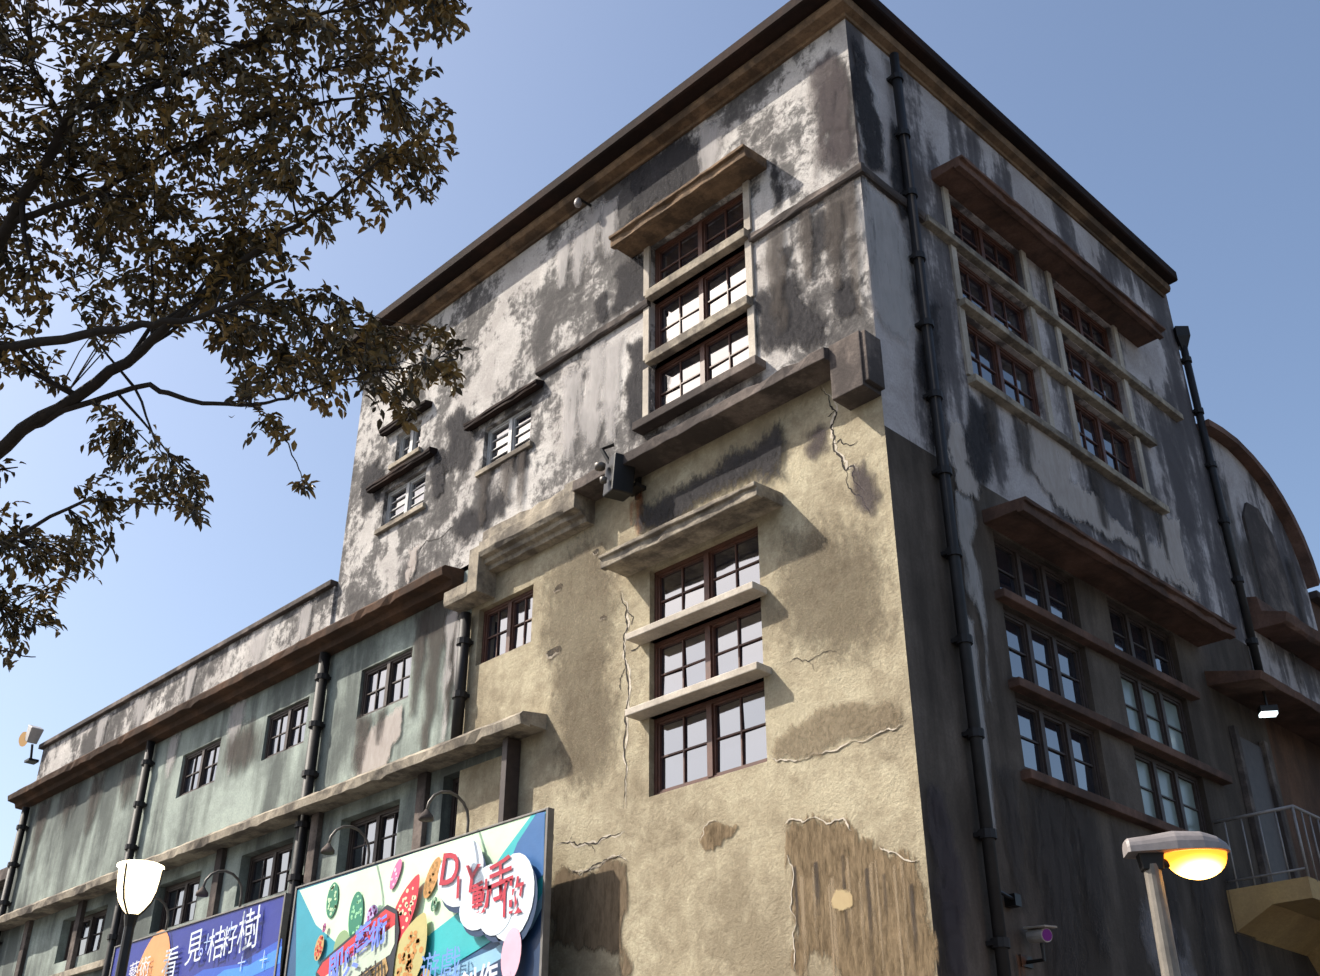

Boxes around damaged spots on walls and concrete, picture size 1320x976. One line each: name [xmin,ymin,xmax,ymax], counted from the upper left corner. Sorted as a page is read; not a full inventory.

water stain [754,36,908,356]
water stain [729,373,762,396]
water stain [359,457,383,517]
water stain [430,406,530,543]
crack [821,388,870,513]
water stain [852,461,881,515]
water stain [405,545,419,584]
flaking render [770,700,901,762]
flaking render [699,820,737,851]
flaking render [550,856,632,976]
flaking render [785,813,939,976]